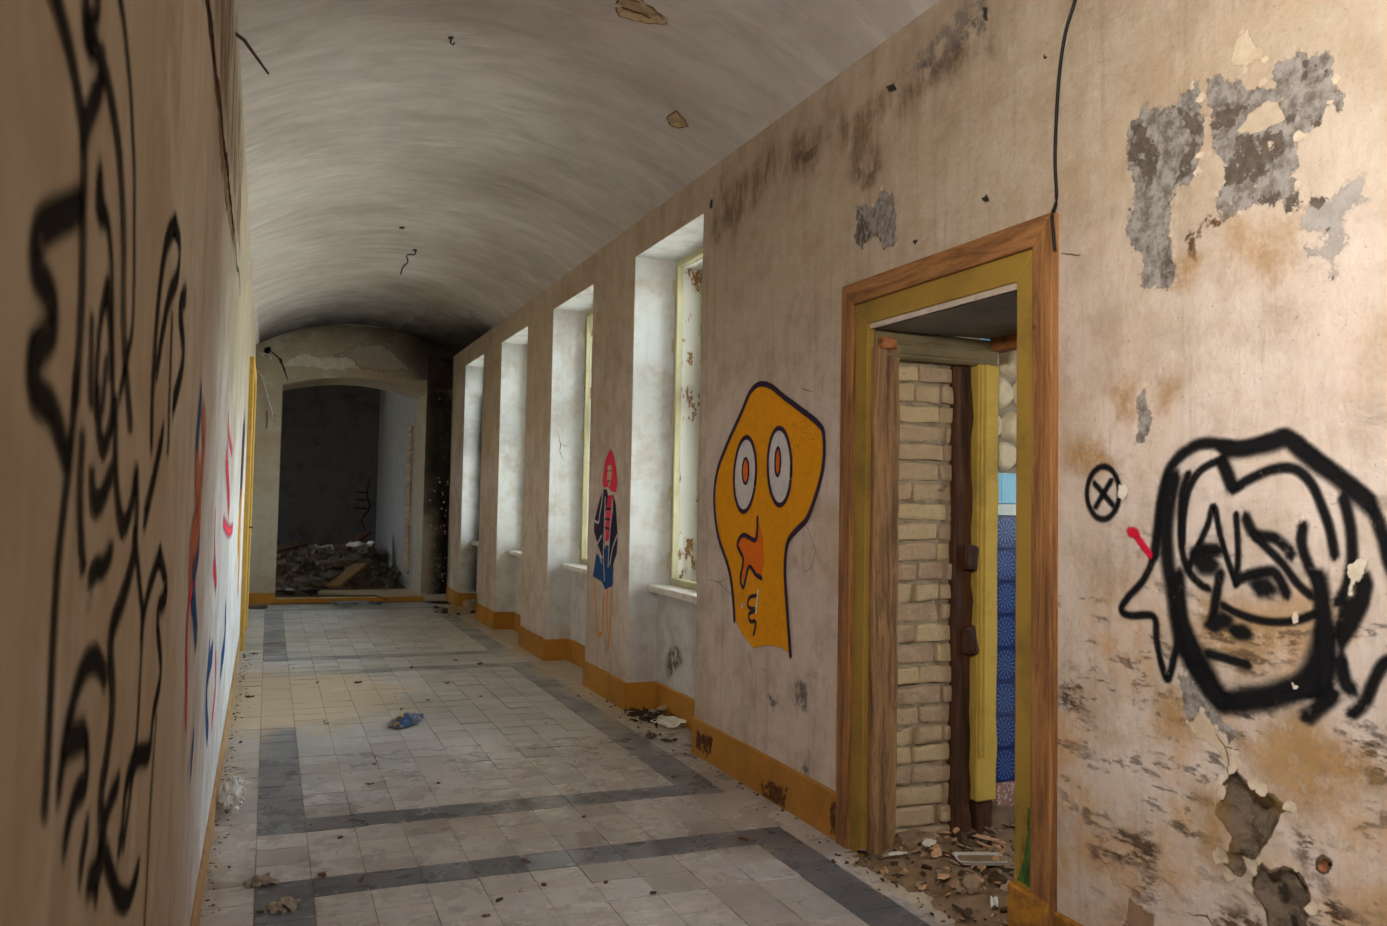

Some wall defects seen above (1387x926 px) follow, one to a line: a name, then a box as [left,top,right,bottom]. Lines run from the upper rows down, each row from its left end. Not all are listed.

flaking render [614,0,670,28]
flaking render [666,110,689,129]
peeling [1124,29,1365,292]
peeling [852,185,917,250]
peeling [1132,381,1153,446]
peeling [1347,558,1369,596]
leakage [1241,712,1387,804]
flaking render [1178,674,1333,926]
leakage [1095,828,1157,902]
leakage [1214,909,1261,926]
leakage [1309,900,1356,926]